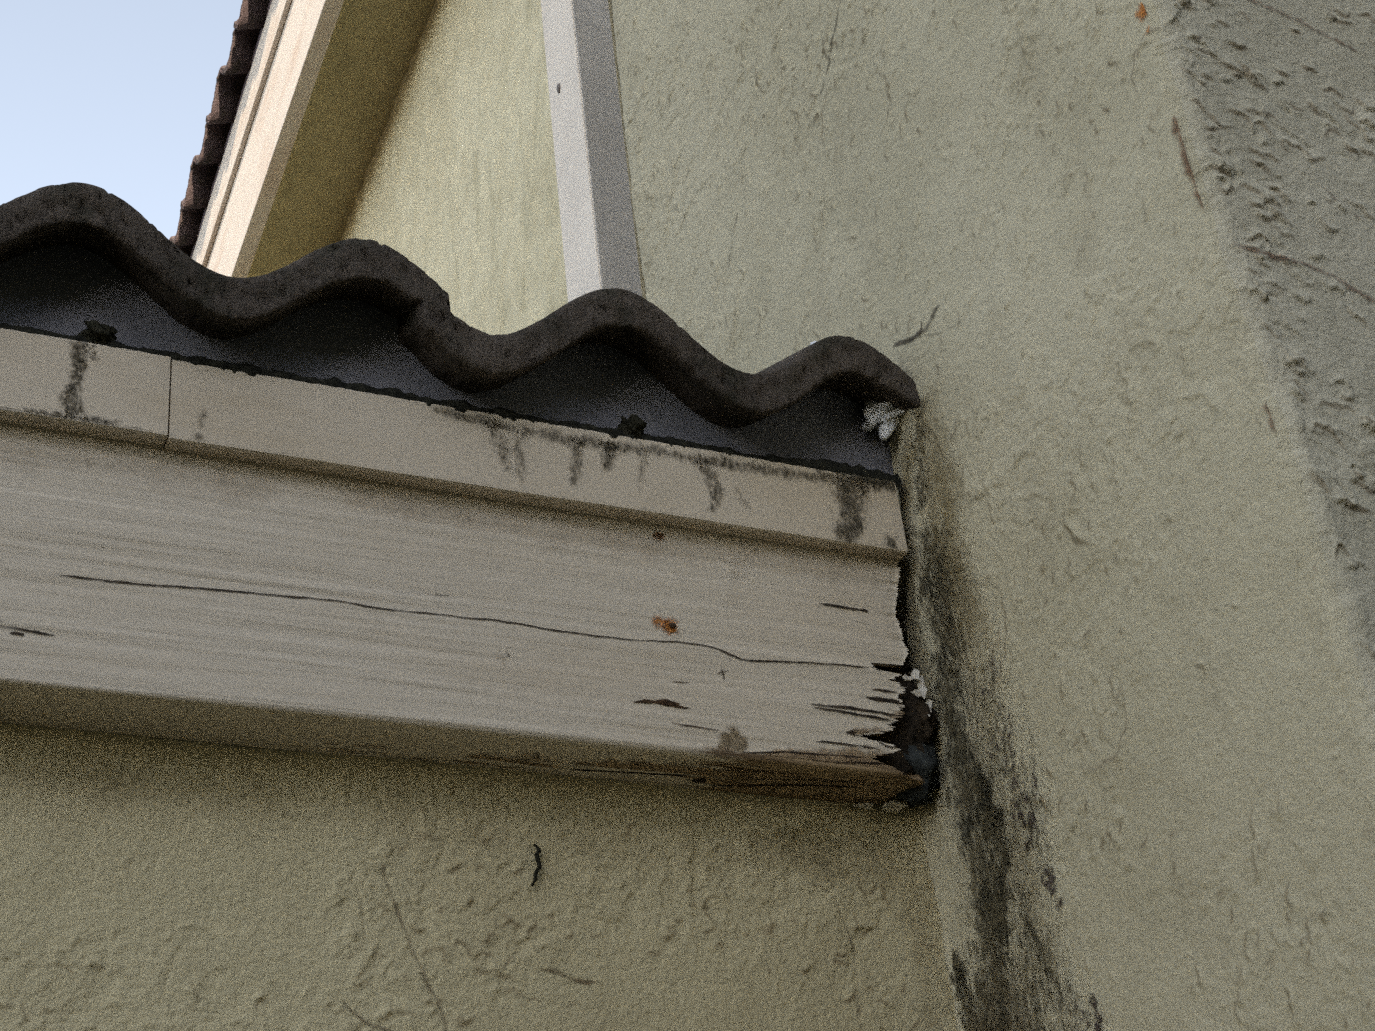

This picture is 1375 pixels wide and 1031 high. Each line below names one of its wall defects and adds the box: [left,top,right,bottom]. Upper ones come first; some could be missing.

leakage [0,341,151,432]
crack [60,575,900,788]
leakage [435,398,1102,1031]
peeling [902,669,932,717]
crack [343,1001,391,1031]